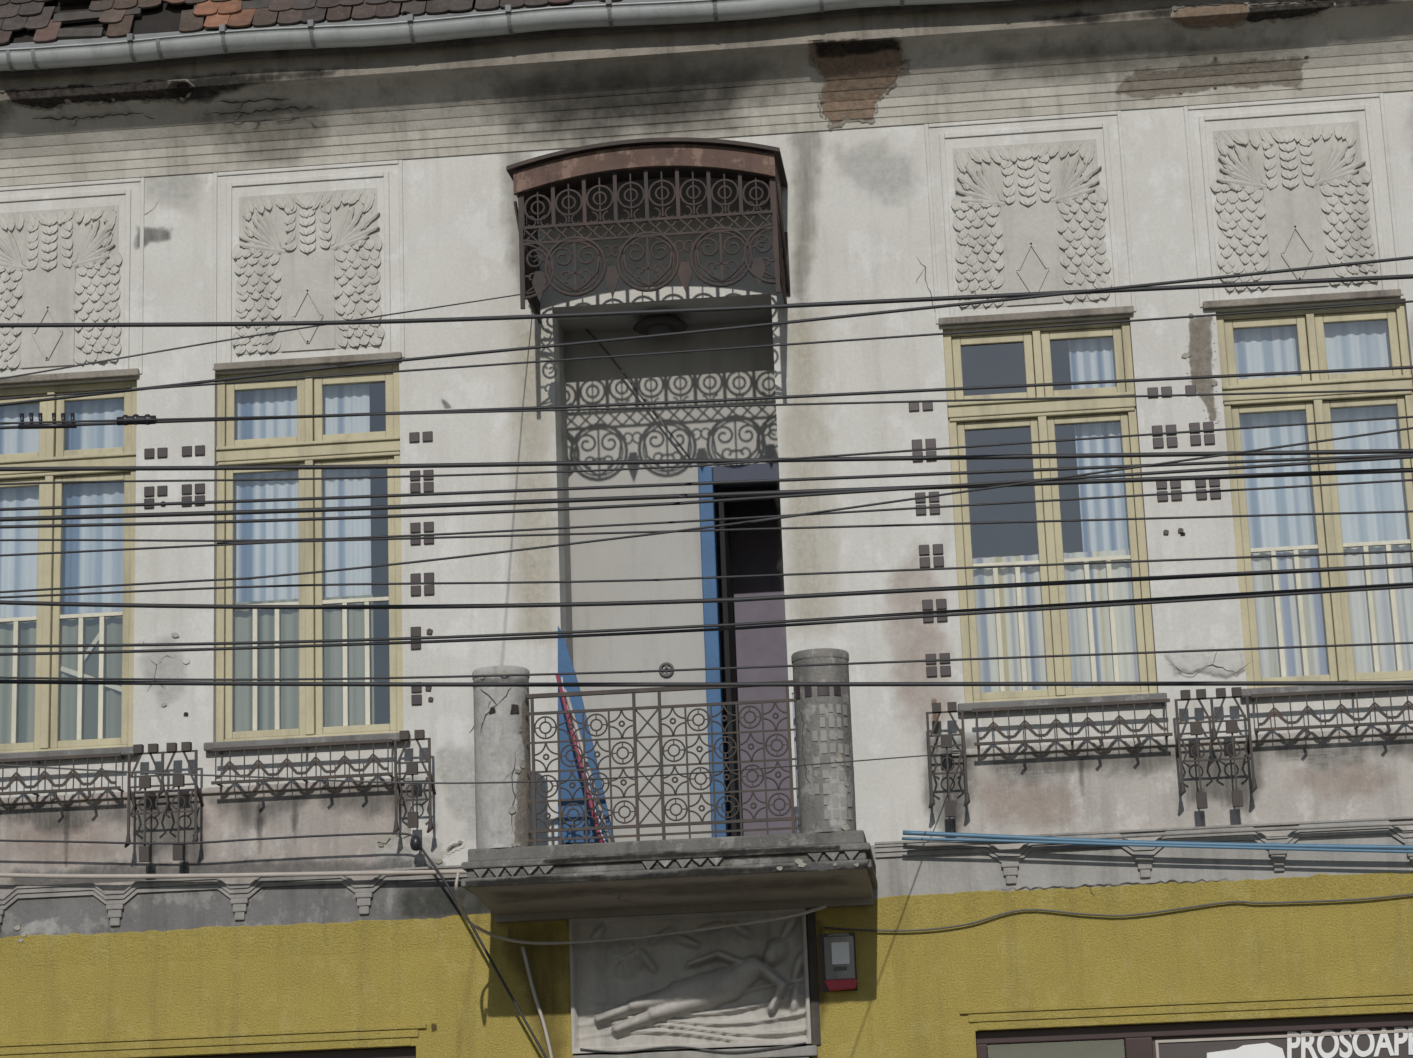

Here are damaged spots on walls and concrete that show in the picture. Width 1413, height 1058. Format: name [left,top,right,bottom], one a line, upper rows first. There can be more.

flaking render [1170,0,1336,31]
crack [32,112,154,126]
flaking render [0,77,195,111]
crack [207,98,319,130]
flaking render [807,37,910,130]
flaking render [1116,56,1309,98]
flaking render [1182,313,1221,425]
crack [469,687,512,733]
leakage [138,799,202,871]